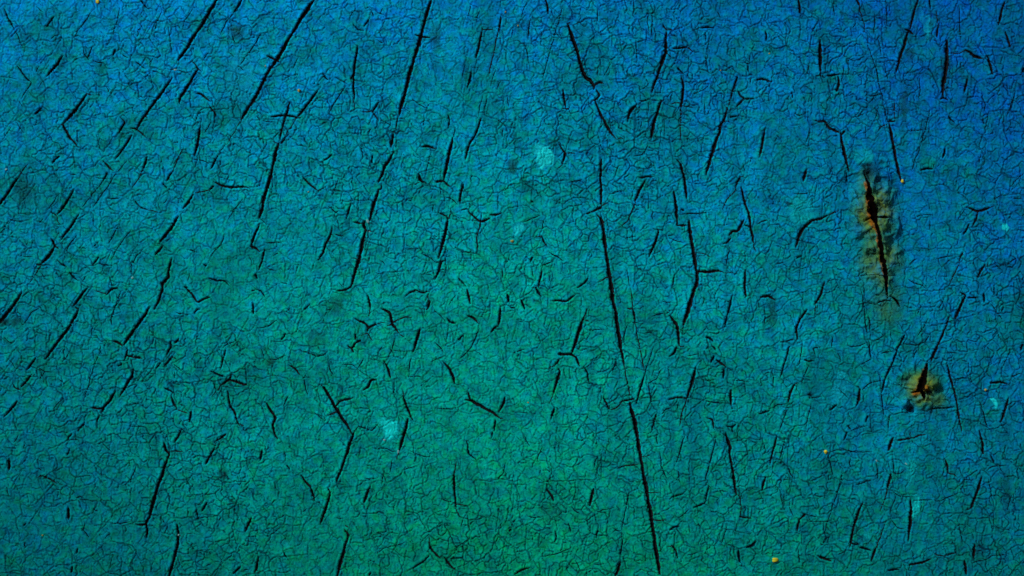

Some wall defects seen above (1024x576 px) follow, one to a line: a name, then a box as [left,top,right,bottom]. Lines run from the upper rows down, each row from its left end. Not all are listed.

crack [521,0,622,140]
crack [0,0,563,576]
crack [549,0,1012,575]
rust [855,184,896,290]
crack [958,155,1023,234]
rust [906,366,943,406]
crack [525,437,629,576]